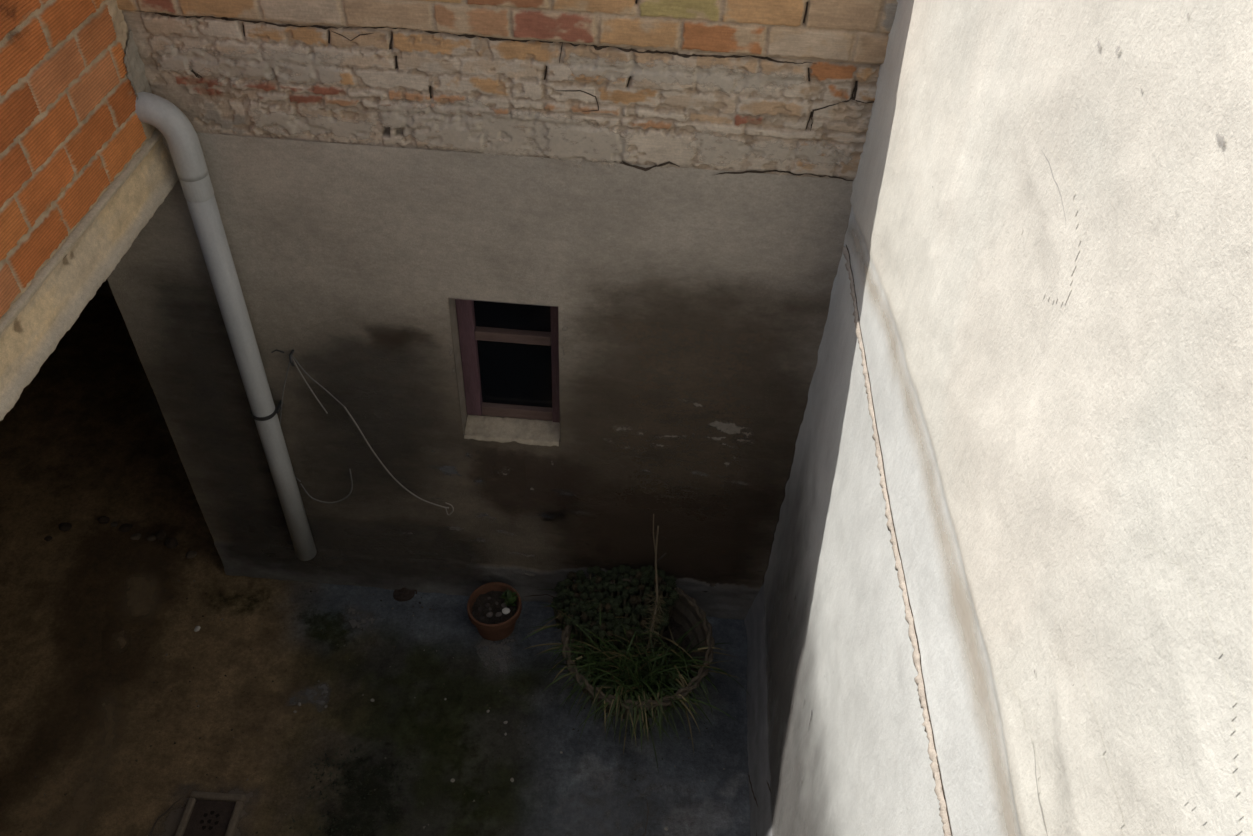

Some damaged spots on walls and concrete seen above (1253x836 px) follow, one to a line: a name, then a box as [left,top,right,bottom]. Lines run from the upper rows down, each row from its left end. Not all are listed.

peeling [377,99,632,165]
peeling [568,53,805,93]
crack [810,81,874,131]
damp [313,331,437,496]
damp [438,285,826,585]
flaking render [707,421,753,465]
damp [240,513,484,580]
crack [846,245,952,836]